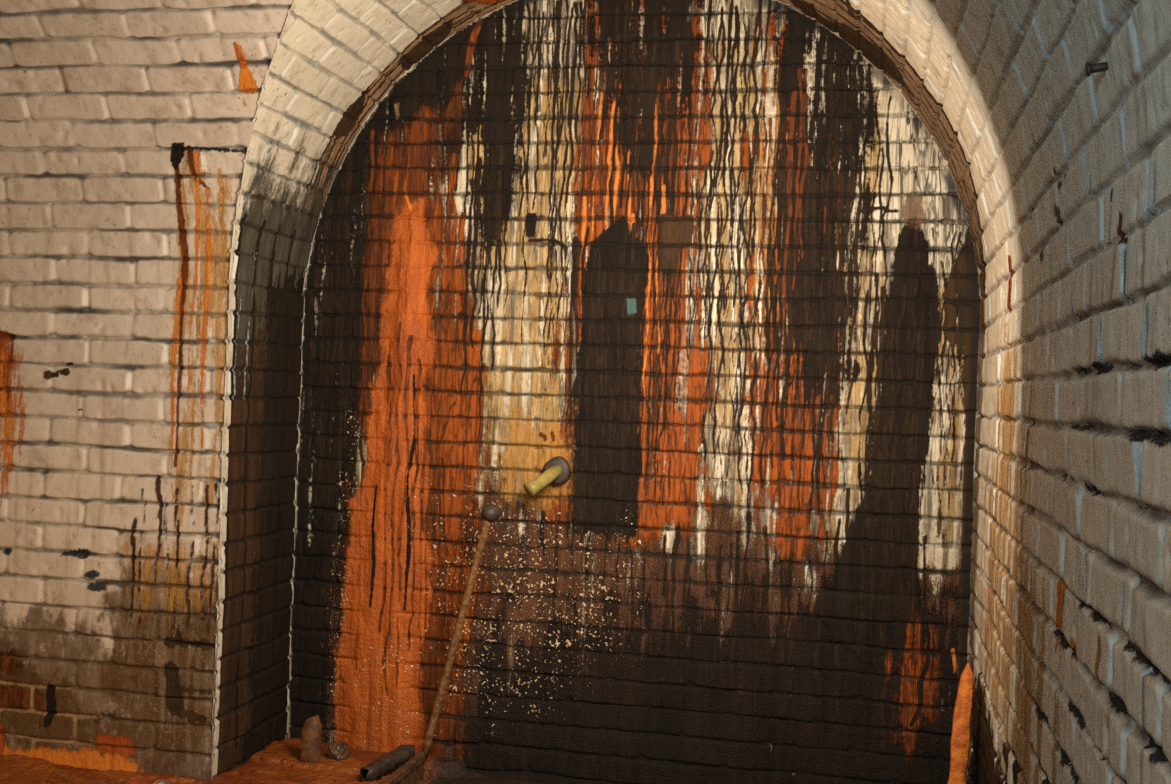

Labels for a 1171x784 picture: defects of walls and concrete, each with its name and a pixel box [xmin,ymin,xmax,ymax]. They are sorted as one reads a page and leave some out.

rust [233,42,259,106]
rust [0,331,26,502]
leakage [61,548,91,559]
rust [169,142,247,525]
rust [328,0,719,760]
leakage [85,0,980,784]
rust [739,13,852,563]
rust [881,198,1079,784]
leakage [966,666,1022,784]
leakage [1031,696,1050,728]
leakage [1058,744,1079,784]